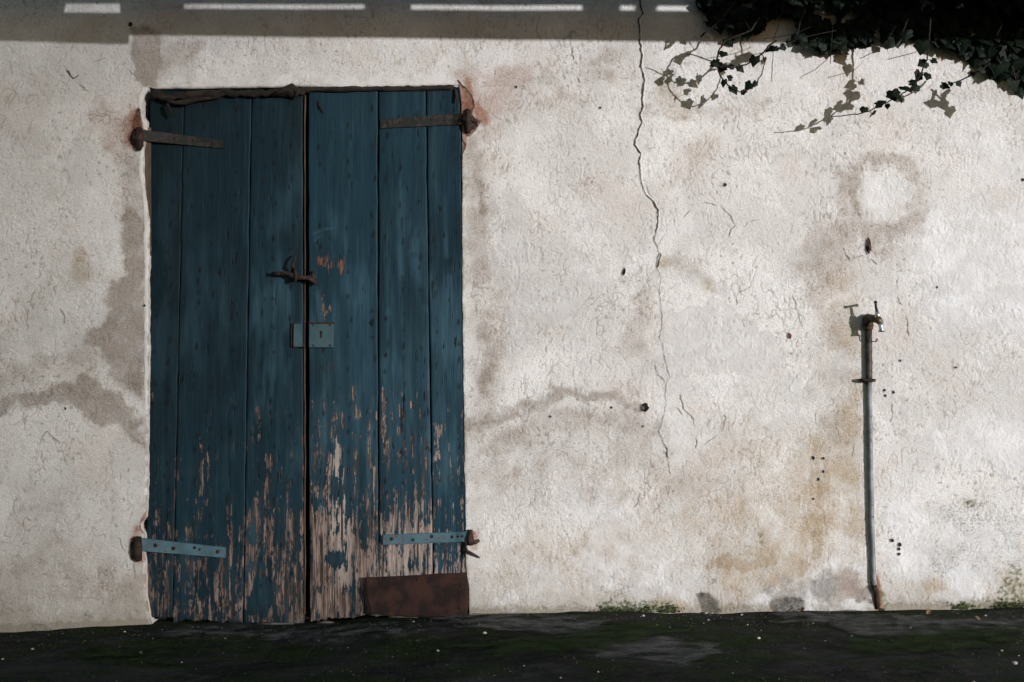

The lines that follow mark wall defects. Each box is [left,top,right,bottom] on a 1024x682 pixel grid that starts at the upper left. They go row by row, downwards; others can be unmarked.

crack [628,0,727,515]